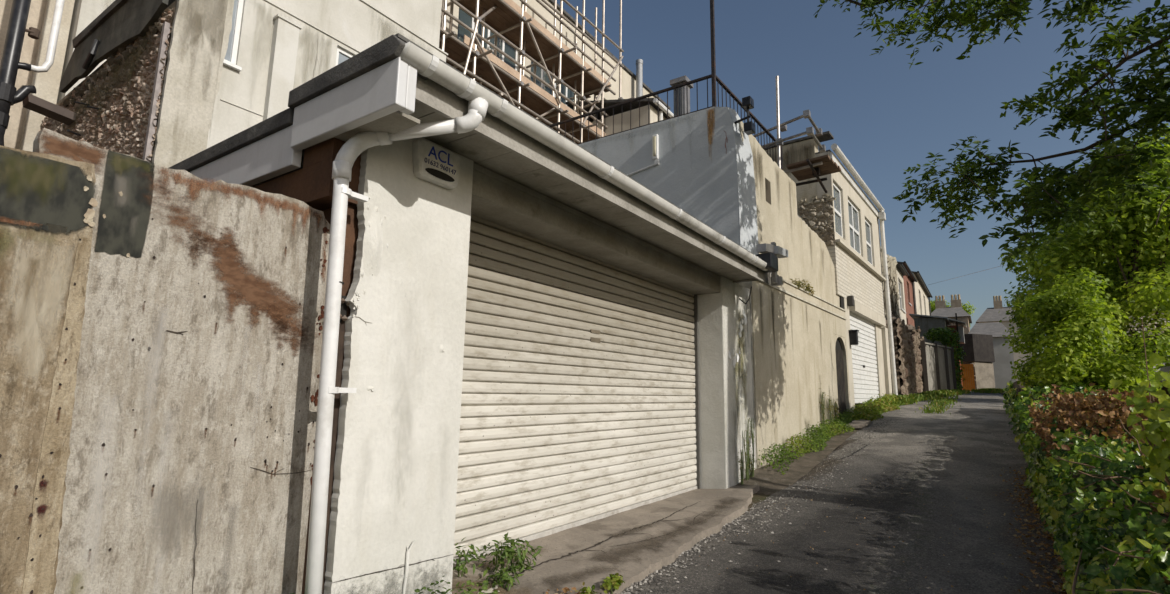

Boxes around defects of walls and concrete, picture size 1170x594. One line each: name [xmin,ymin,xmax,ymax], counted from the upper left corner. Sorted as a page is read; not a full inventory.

leakage [39,131,105,172]
rust [151,169,322,356]